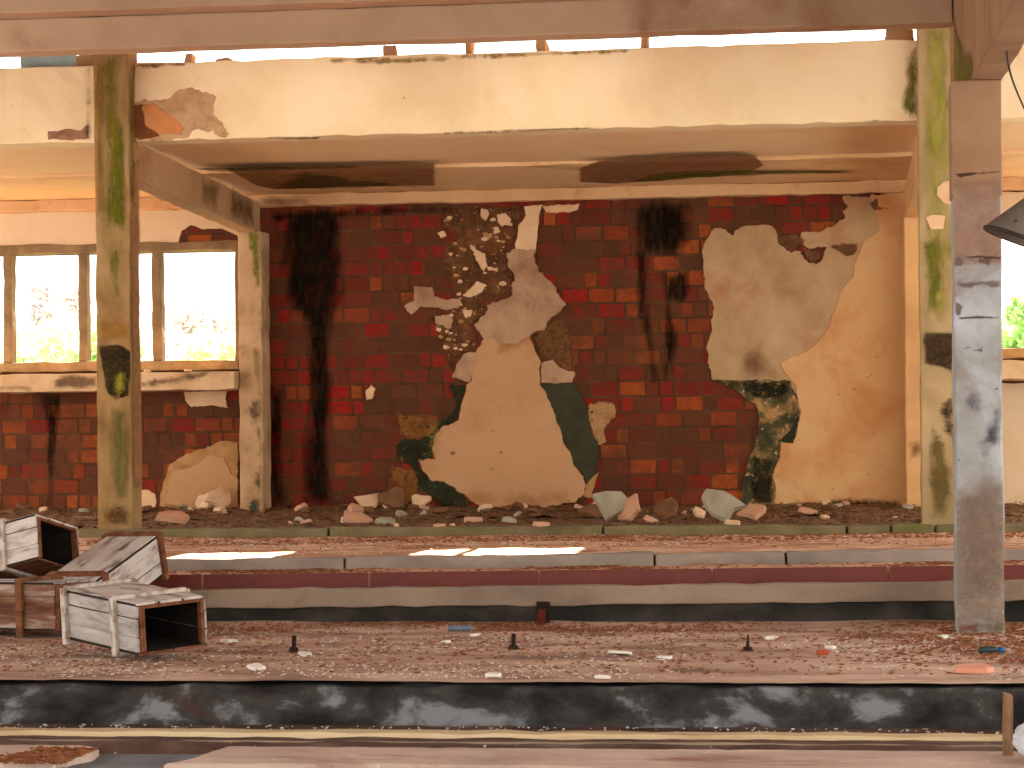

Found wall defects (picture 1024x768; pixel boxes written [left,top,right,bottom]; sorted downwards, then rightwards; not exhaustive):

spalling [133,87,229,141]
damp [275,210,364,503]
peeling [390,204,616,508]
damp [637,202,685,346]
damp [652,274,688,377]
peeling [702,193,906,506]
peeling [142,441,258,512]
damp [250,392,283,502]
damp [941,399,953,434]